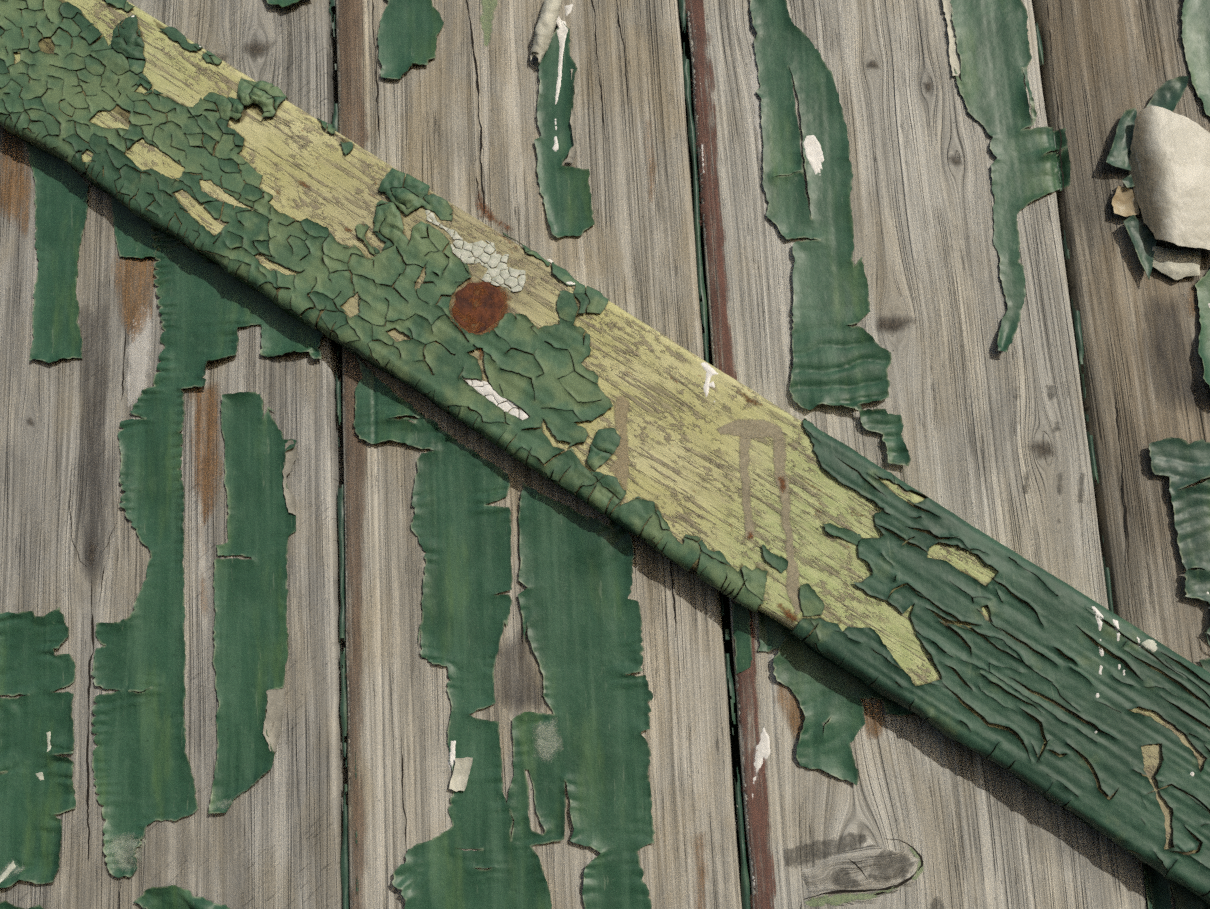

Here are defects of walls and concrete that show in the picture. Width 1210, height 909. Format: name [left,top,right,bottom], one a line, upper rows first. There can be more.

crack [0,0,788,624]
rust [453,282,508,334]
peeling [531,0,595,238]
peeling [750,0,911,466]
peeling [942,0,1071,352]
crack [1047,3,1069,257]
peeling [1106,0,1210,387]
peeling [0,607,76,909]
peeling [91,196,323,878]
crack [400,737,408,849]
peeling [335,355,655,909]
crack [790,393,1210,906]